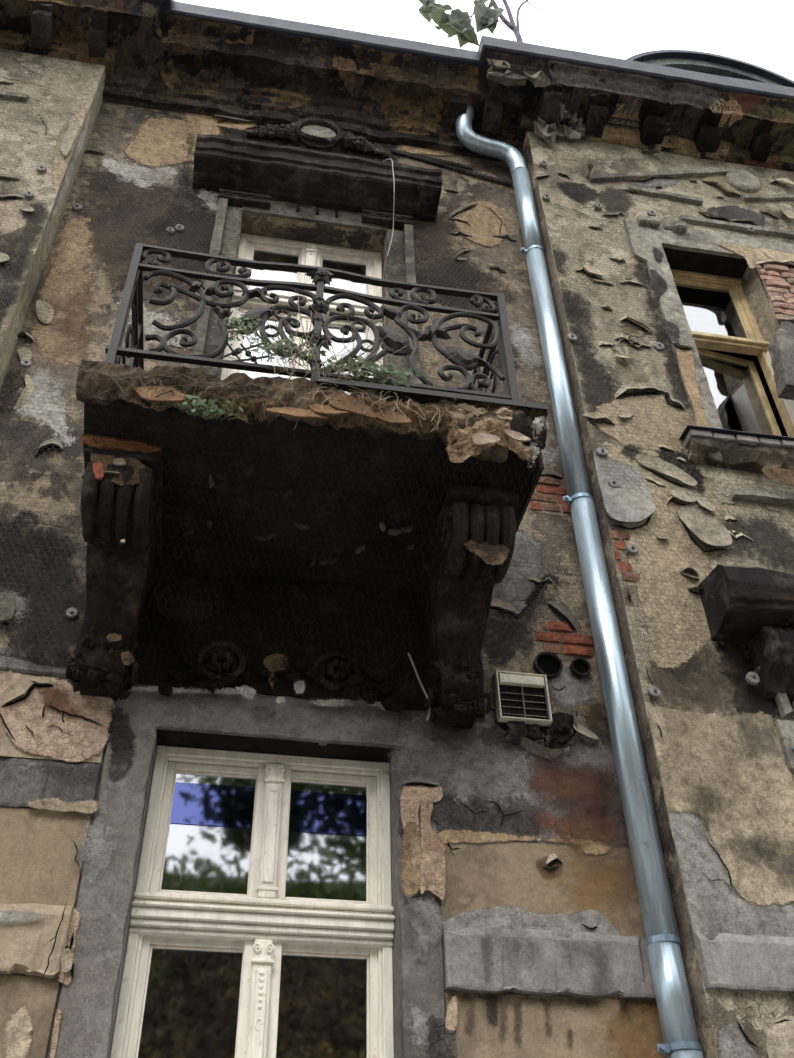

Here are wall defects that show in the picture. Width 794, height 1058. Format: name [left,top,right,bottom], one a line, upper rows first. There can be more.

spalling [0,0,125,70]
spalling [155,13,256,97]
spalling [244,87,311,112]
peeling [0,105,257,413]
flaking render [718,242,794,321]
peeling [583,341,753,669]
peeling [0,671,116,763]
peeling [388,601,611,900]
crack [42,900,68,983]
damp [447,938,605,1043]